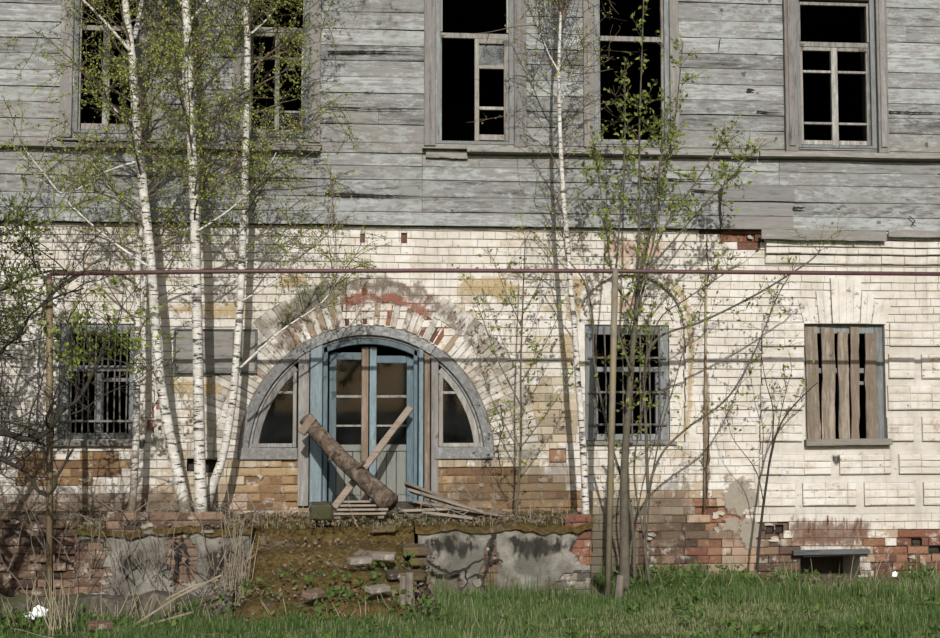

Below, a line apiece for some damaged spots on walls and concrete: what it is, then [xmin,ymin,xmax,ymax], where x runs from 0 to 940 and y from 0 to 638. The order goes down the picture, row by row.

spalling [0,511,223,597]
crack [428,534,503,591]
spalling [630,474,801,578]